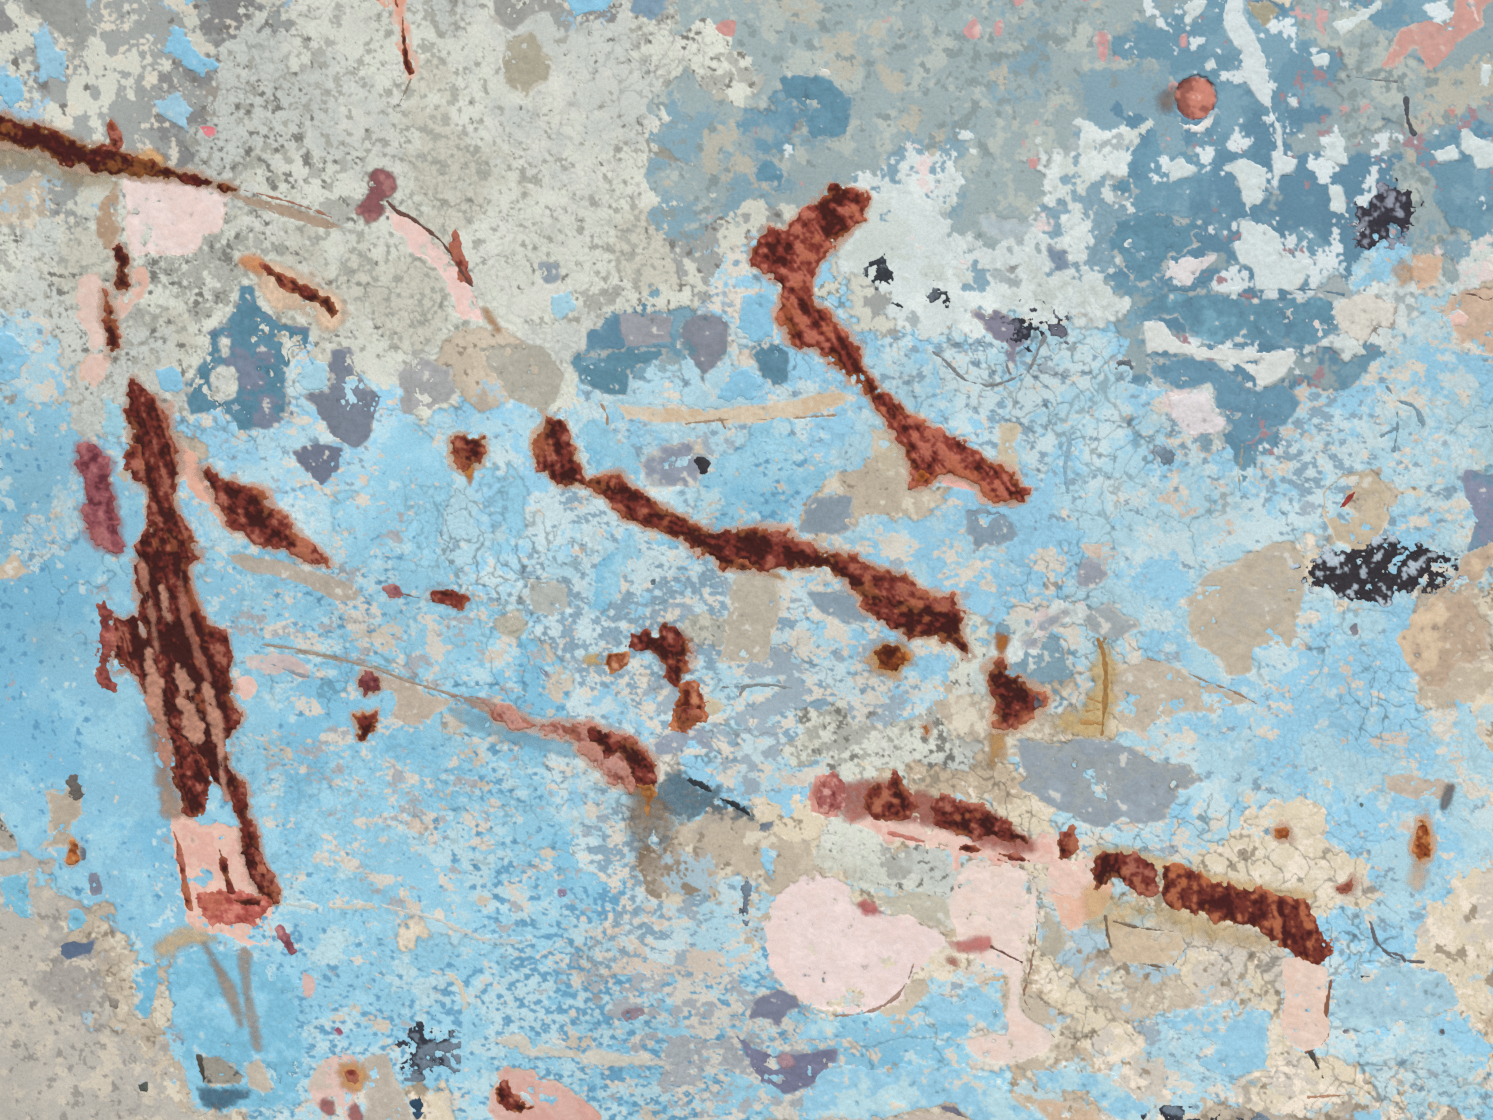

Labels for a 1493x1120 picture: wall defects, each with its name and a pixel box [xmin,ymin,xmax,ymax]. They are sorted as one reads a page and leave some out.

corrosion [0,110,332,218]
peeling [1161,57,1220,134]
peeling [1431,106,1493,174]
corrosion [748,182,1032,508]
peeling [1104,156,1493,445]
peeling [0,774,88,922]
corrosion [74,376,333,955]
corrosion [451,695,660,816]
corrosion [529,412,1052,763]
corrosion [807,769,1334,965]
peeling [1394,467,1493,689]
peeling [129,937,316,1120]